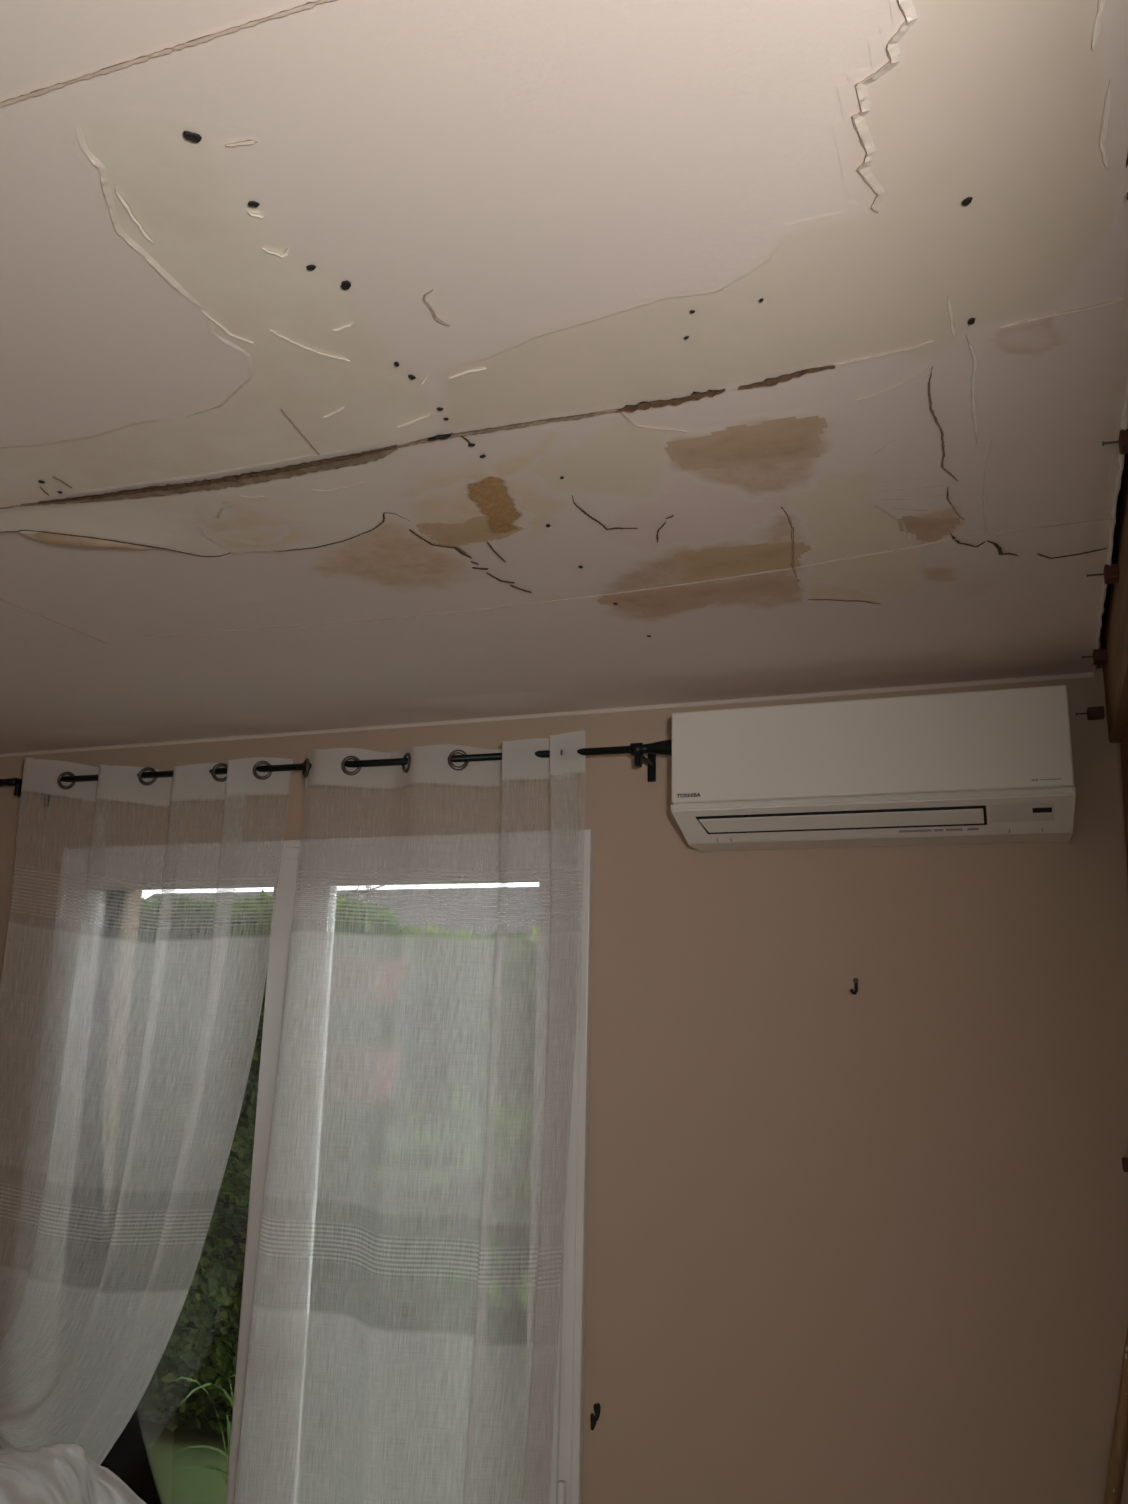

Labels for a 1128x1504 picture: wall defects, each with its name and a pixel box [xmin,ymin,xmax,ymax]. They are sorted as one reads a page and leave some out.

crack [0,0,333,107]
crack [423,289,450,326]
water stain [197,428,581,597]
crack [0,341,1116,637]
water stain [590,411,886,626]
water stain [898,501,1003,601]